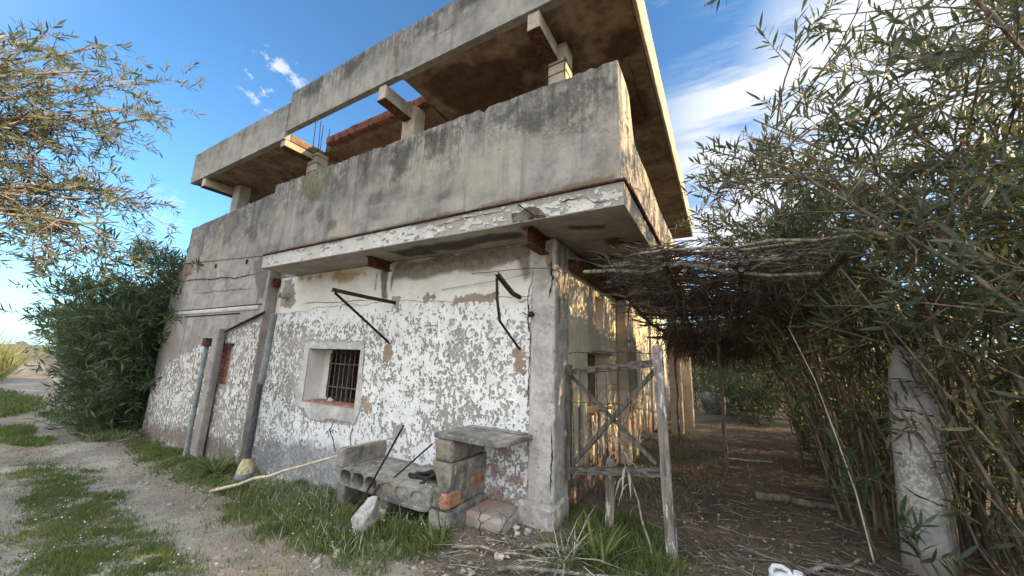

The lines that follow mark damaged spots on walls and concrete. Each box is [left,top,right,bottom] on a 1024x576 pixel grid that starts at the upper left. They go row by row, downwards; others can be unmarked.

damp [430,60,539,117]
peeling [262,186,623,268]
crack [181,272,262,293]
peeling [142,281,532,506]